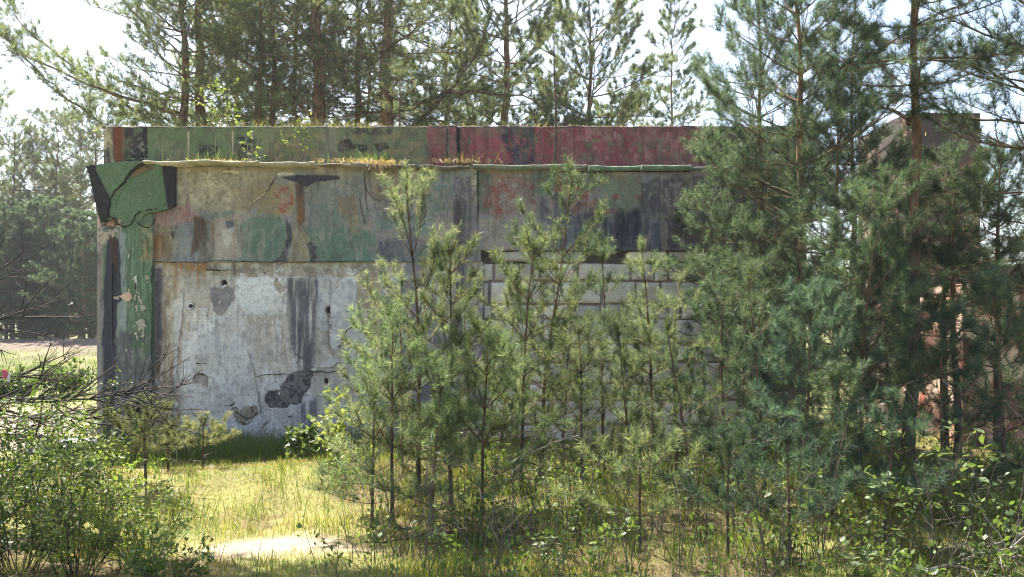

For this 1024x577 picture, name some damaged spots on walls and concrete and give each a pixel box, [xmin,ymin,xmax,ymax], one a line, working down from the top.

crack [446,127,479,221]
crack [109,262,117,348]
peeling [113,273,149,353]
spalling [193,374,207,388]
spalling [199,284,234,319]
crack [151,260,377,428]
peeling [233,276,358,426]
leakage [288,279,331,371]